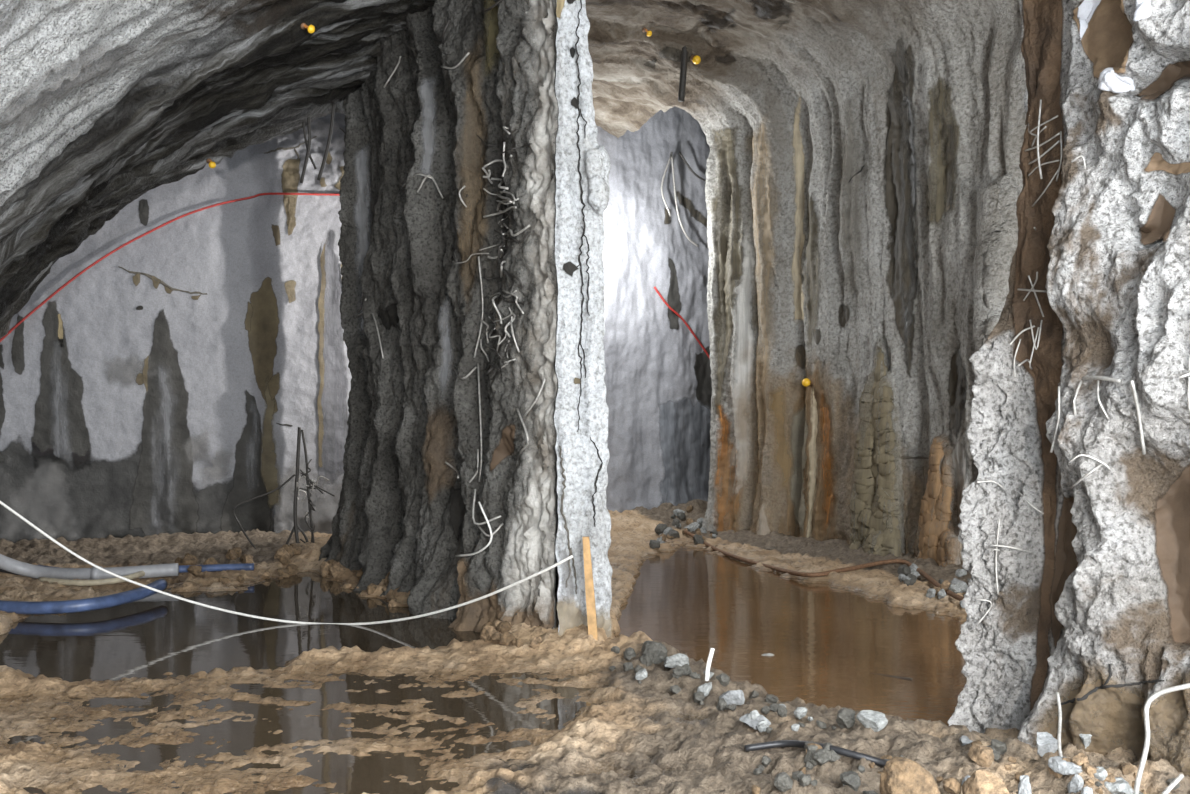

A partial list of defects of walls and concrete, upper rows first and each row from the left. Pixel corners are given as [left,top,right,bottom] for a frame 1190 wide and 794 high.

spalling [1073,0,1190,100]
crack [559,0,603,594]
damp [0,230,348,543]
rust [715,405,741,533]
rust [779,368,848,542]